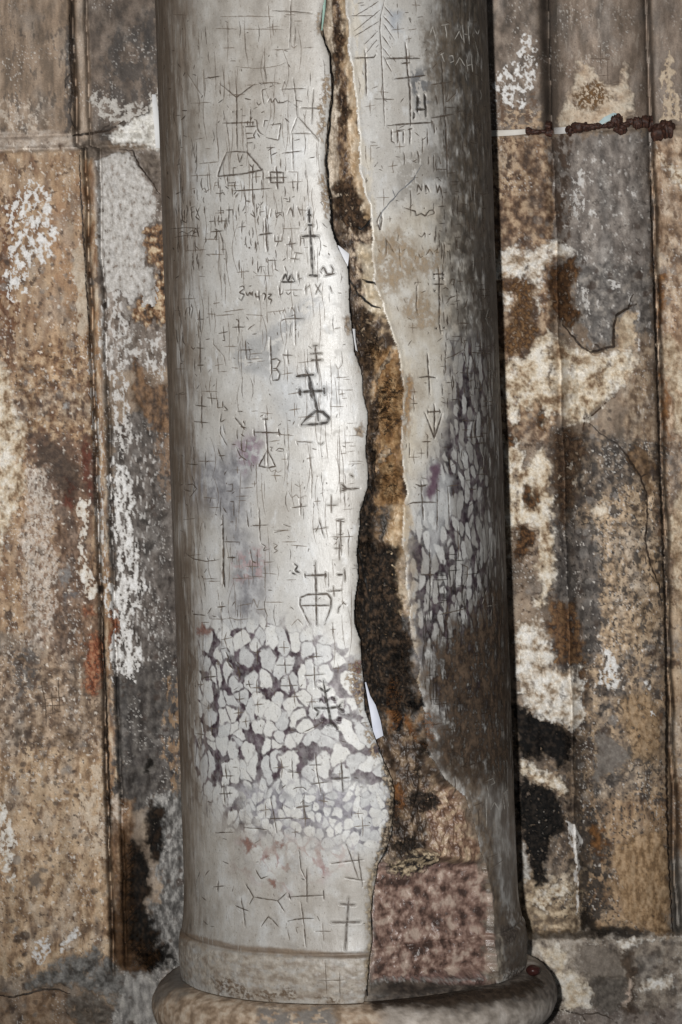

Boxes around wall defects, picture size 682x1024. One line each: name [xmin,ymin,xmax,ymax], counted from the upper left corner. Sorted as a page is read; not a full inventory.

crack [322,8,420,366]
rust [525,113,675,142]
crack [354,433,393,784]
crack [562,146,673,935]
water stain [111,804,166,974]
crack [366,824,393,996]